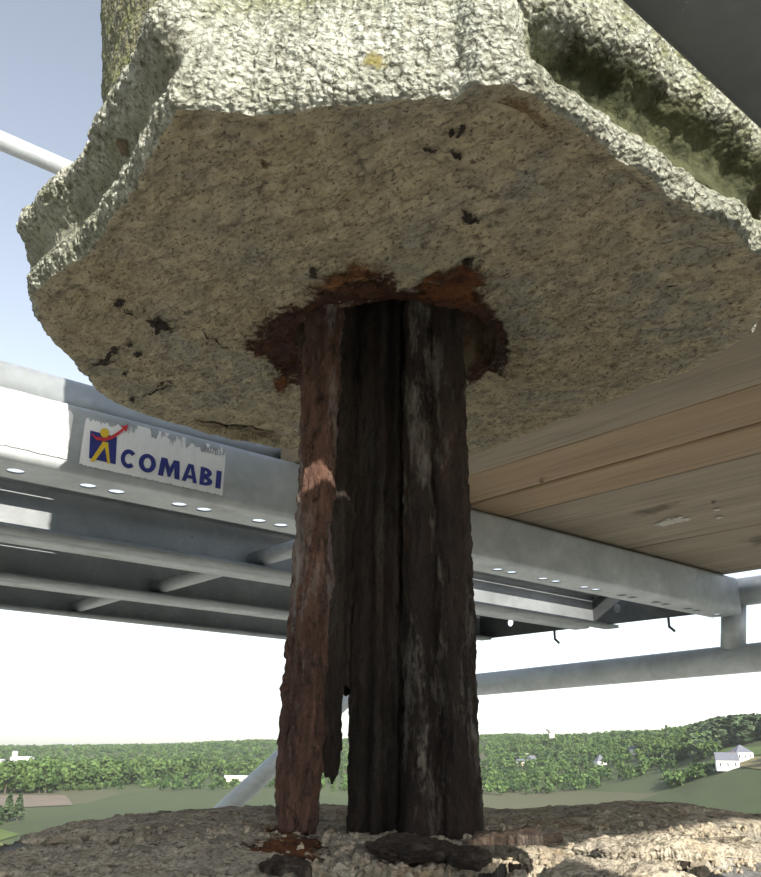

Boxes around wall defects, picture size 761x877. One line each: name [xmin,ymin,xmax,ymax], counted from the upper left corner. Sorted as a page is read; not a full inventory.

rust [241,263,510,393]